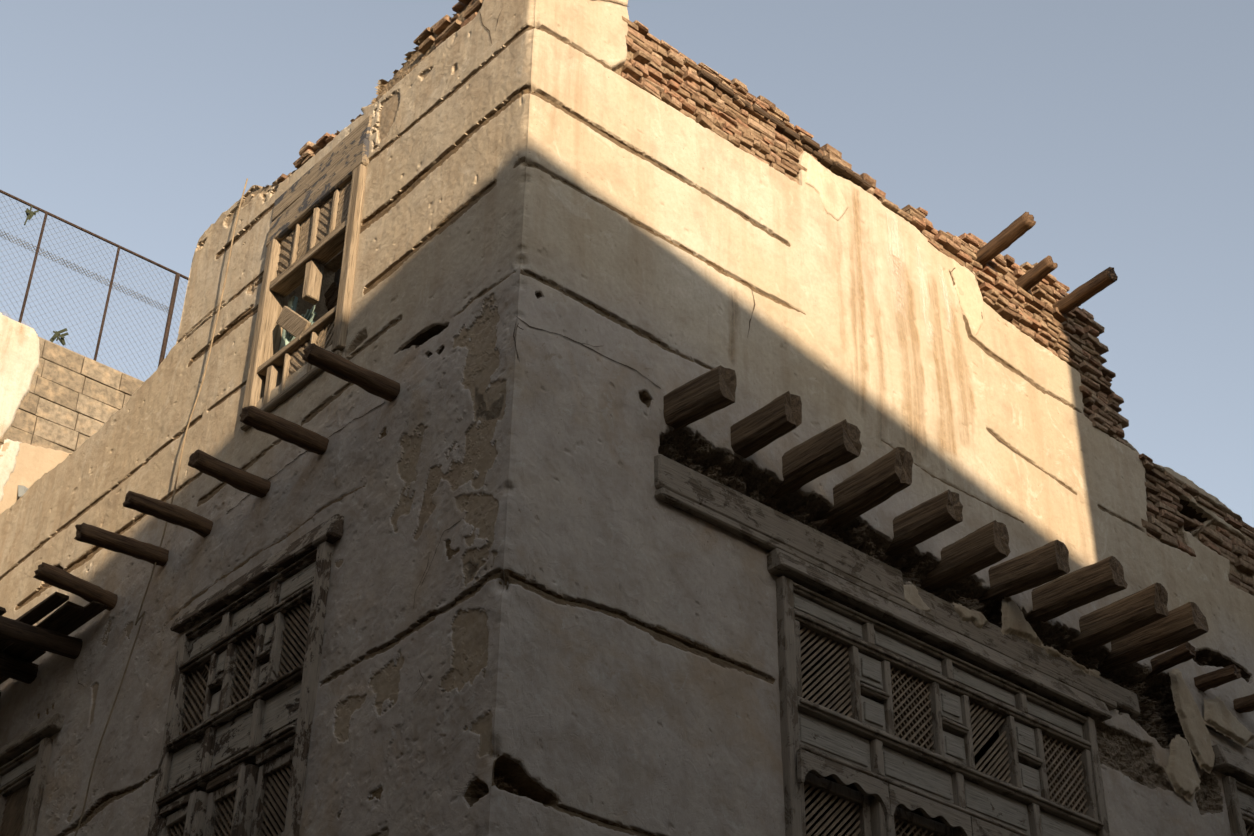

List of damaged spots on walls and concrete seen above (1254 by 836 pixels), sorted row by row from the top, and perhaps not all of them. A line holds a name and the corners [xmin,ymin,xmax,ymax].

peeling [379,294,506,588]
peeling [334,650,404,742]
peeling [440,609,489,693]
flaking render [658,429,1254,815]
flaking render [464,778,489,807]